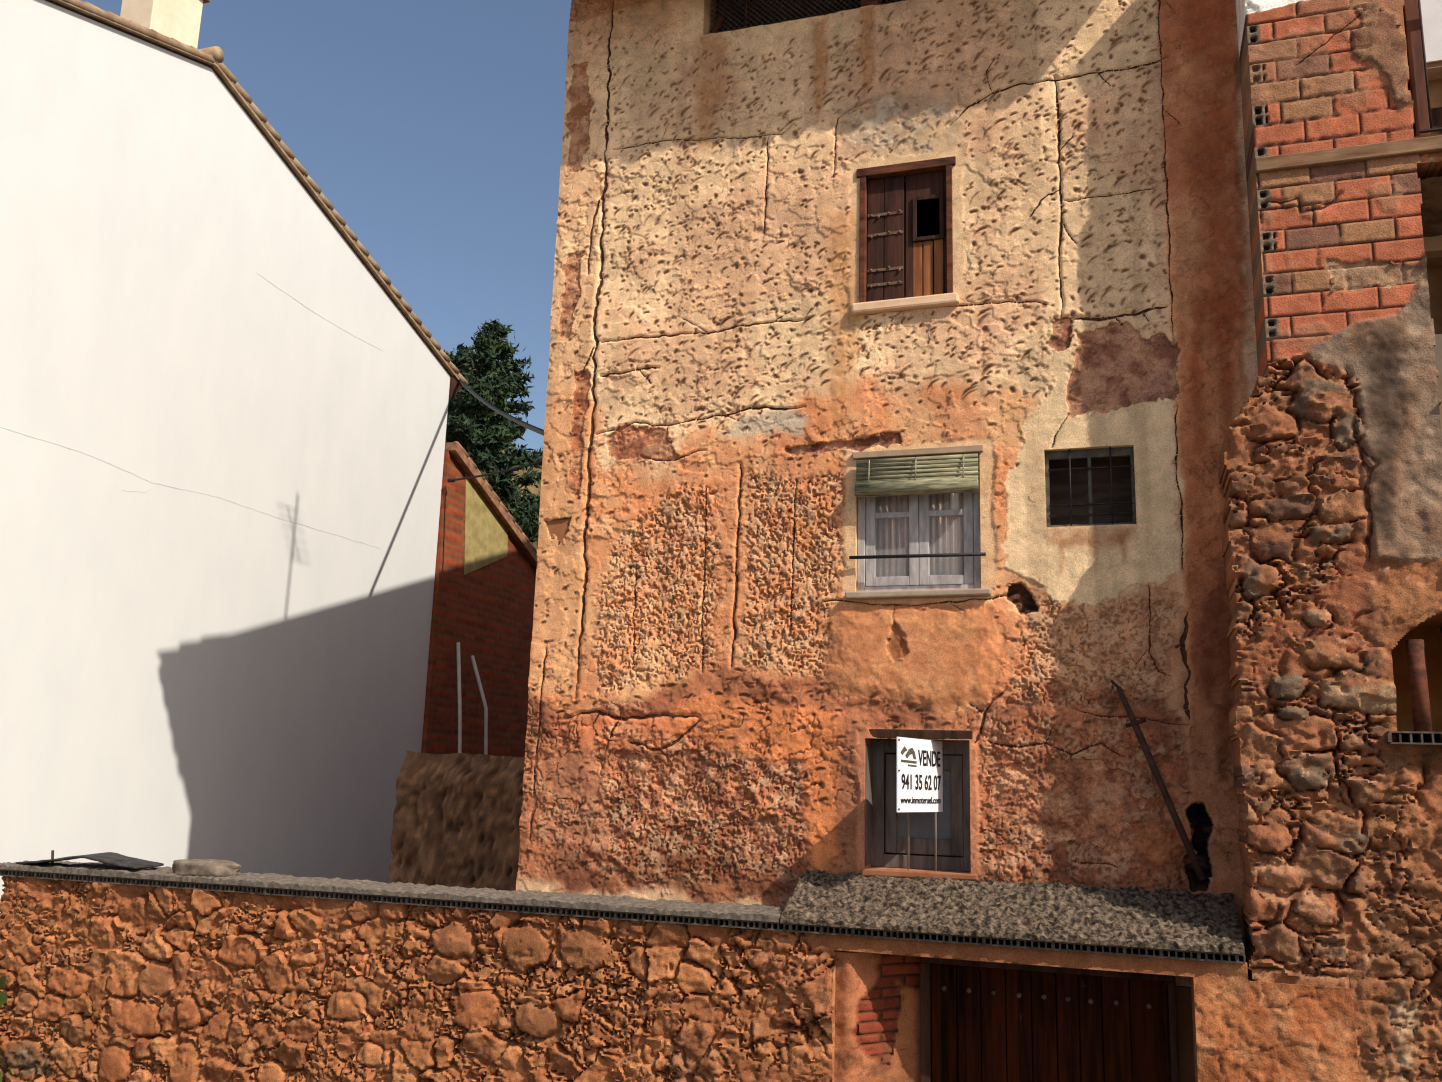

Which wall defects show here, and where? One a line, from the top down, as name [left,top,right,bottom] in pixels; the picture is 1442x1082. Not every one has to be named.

spalling [1351,0,1412,103]
crack [833,104,863,175]
spalling [1324,259,1427,293]
spalling [1049,316,1180,418]
crack [530,0,803,837]
spalling [784,432,902,456]
crack [1174,411,1184,568]
spalling [1004,583,1038,615]
crack [970,587,1191,770]